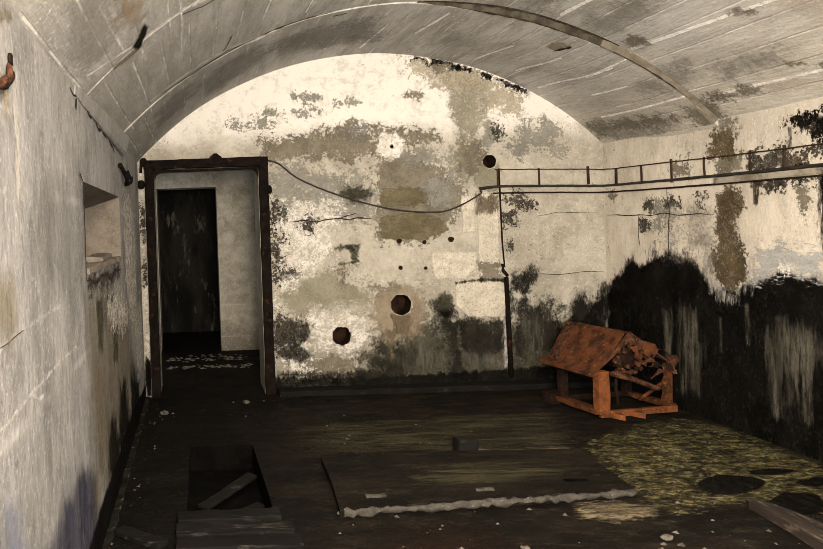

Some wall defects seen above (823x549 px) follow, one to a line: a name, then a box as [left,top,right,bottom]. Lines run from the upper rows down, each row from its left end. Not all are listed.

water stain [474,163,501,215]
water stain [713,104,823,249]
crack [0,303,66,354]
water stain [273,205,823,462]